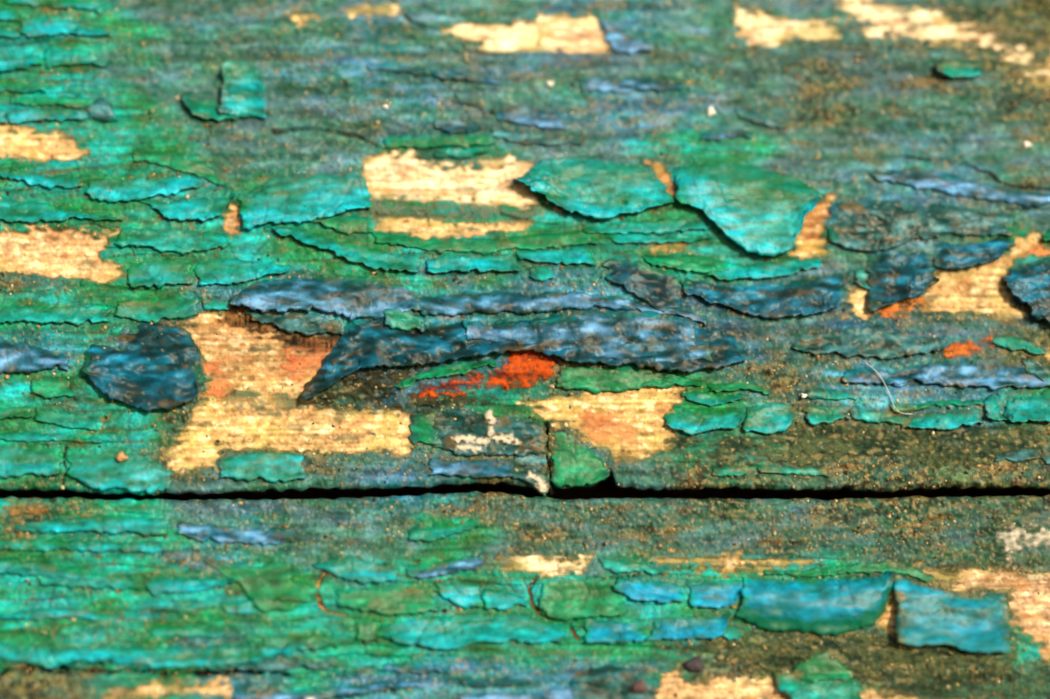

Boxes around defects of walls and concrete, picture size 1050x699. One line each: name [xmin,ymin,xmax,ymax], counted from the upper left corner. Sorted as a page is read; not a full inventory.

peeling [0,0,1050,497]
peeling [0,514,318,615]
peeling [407,519,483,542]
peeling [0,606,101,621]
peeling [311,549,1050,661]
peeling [0,625,450,699]
peeling [457,652,919,699]